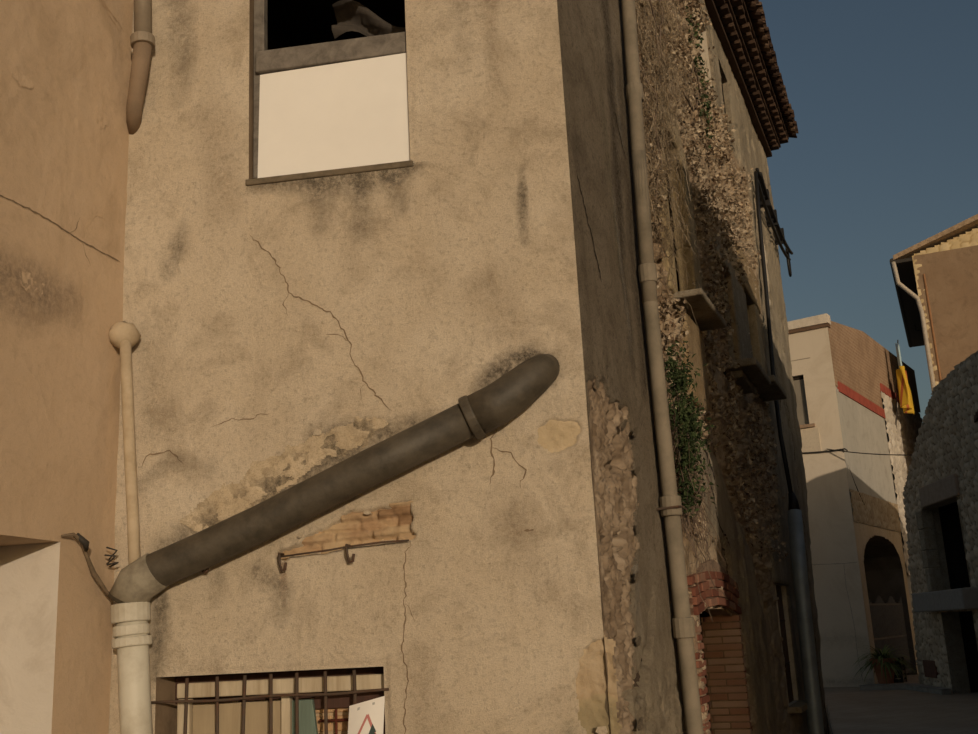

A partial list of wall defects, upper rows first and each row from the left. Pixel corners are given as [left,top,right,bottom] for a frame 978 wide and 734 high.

crack [0,195,120,262]
crack [577,175,601,278]
crack [249,234,389,409]
flaking render [180,416,389,532]
flaking render [281,501,416,561]
flaking render [576,376,643,734]
crack [401,543,415,734]